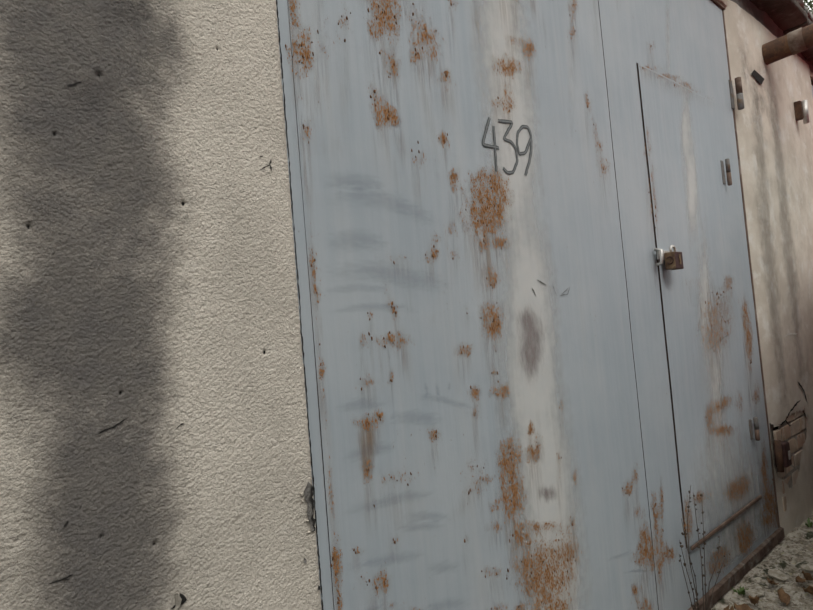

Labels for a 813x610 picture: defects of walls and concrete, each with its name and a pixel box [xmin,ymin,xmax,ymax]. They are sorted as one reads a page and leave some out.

corrosion [285,0,329,79]
corrosion [368,86,403,132]
corrosion [367,0,442,78]
corrosion [492,36,537,113]
corrosion [423,166,514,263]
corrosion [479,267,506,351]
damp [483,0,578,610]
corrosion [688,276,752,371]
corrosion [470,369,510,414]
spalling [773,408,807,512]
corrosion [460,423,582,610]
corrosion [631,481,677,585]